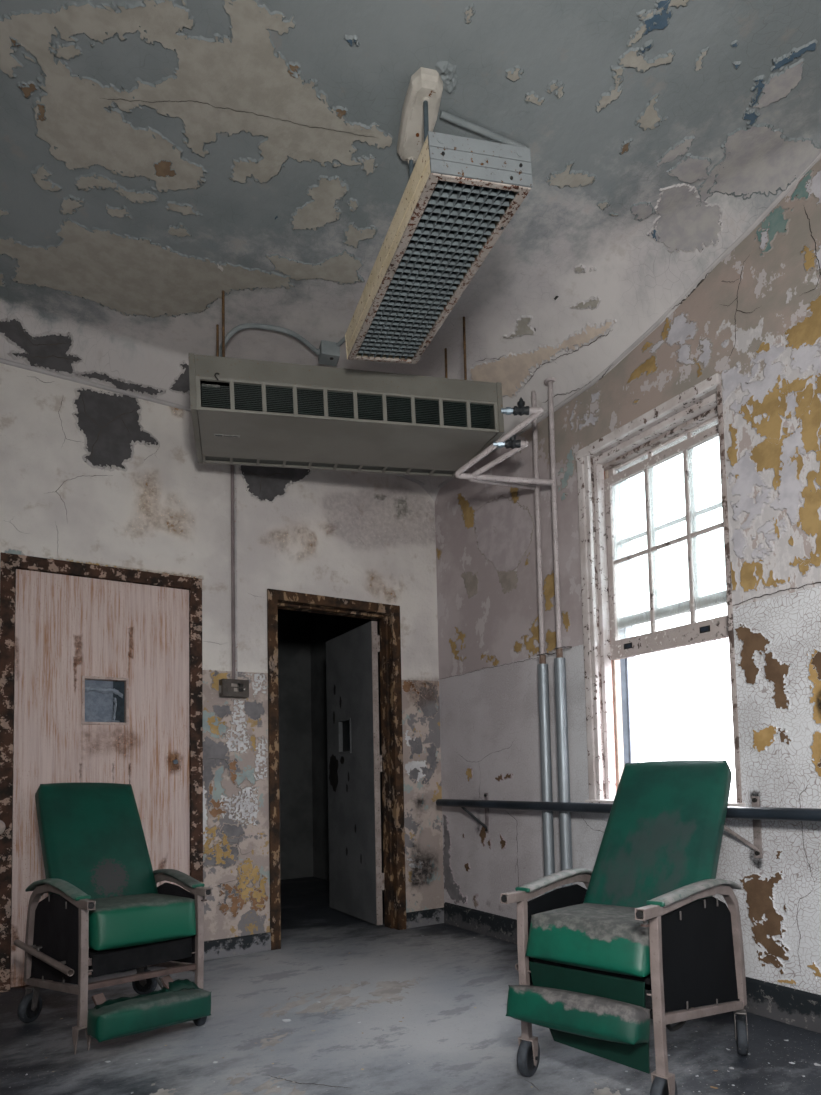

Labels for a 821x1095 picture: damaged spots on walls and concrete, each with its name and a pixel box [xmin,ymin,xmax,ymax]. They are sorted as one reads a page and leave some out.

peeling [0,0,393,318]
crack [102,98,372,137]
spalling [0,315,190,472]
peeling [721,244,821,593]
peeling [203,670,269,918]
peeling [404,729,439,786]
peeling [513,570,571,659]
peeling [734,623,792,711]
peeling [752,724,793,754]
crack [733,582,821,606]
peeling [806,648,821,778]
peeling [739,850,799,986]